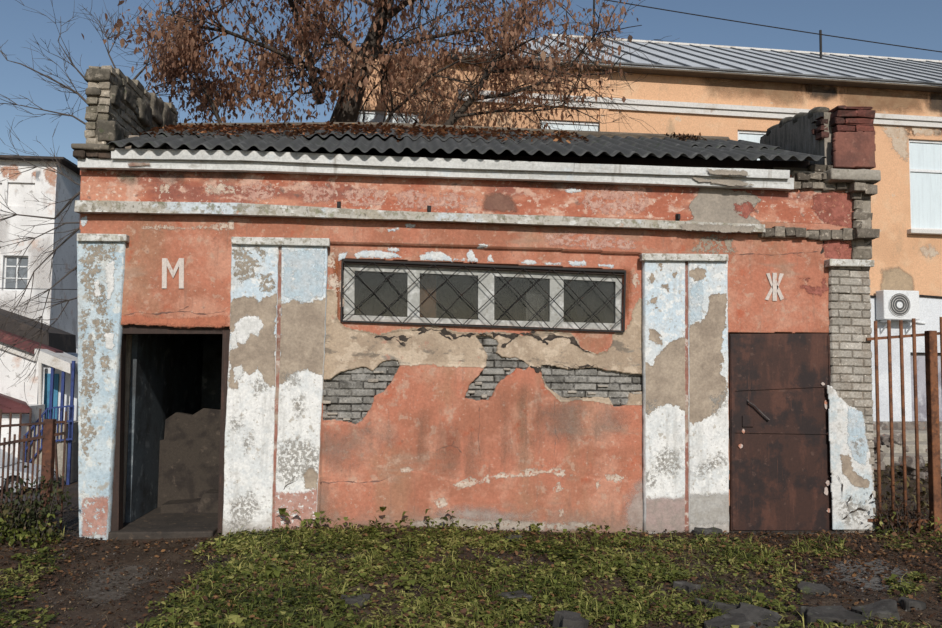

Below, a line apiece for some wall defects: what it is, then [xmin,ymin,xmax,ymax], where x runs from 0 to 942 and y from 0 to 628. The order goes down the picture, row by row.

peeling [205,182,274,201]
peeling [303,184,477,209]
peeling [566,186,649,216]
spalling [734,202,755,219]
spalling [811,191,854,228]
spalling [78,242,728,456]
peeling [274,440,319,531]
crack [318,477,386,485]
peeling [646,448,681,487]
peeling [821,382,876,530]
peeling [82,496,109,536]
peeling [230,492,259,529]